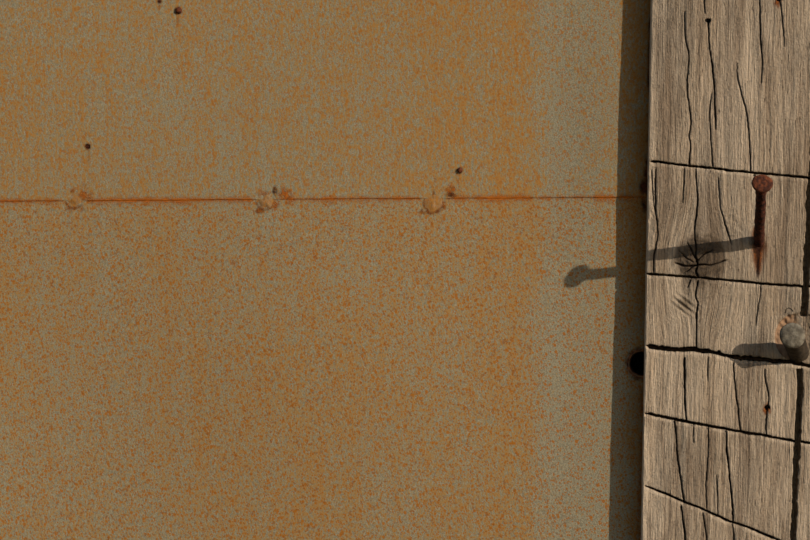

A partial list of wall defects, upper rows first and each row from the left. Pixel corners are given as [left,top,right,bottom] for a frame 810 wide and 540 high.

crack [757,2,765,80]
crack [737,73,755,177]
corrosion [594,160,648,210]
crack [650,169,658,272]
crack [674,0,741,540]
corrosion [753,229,766,275]